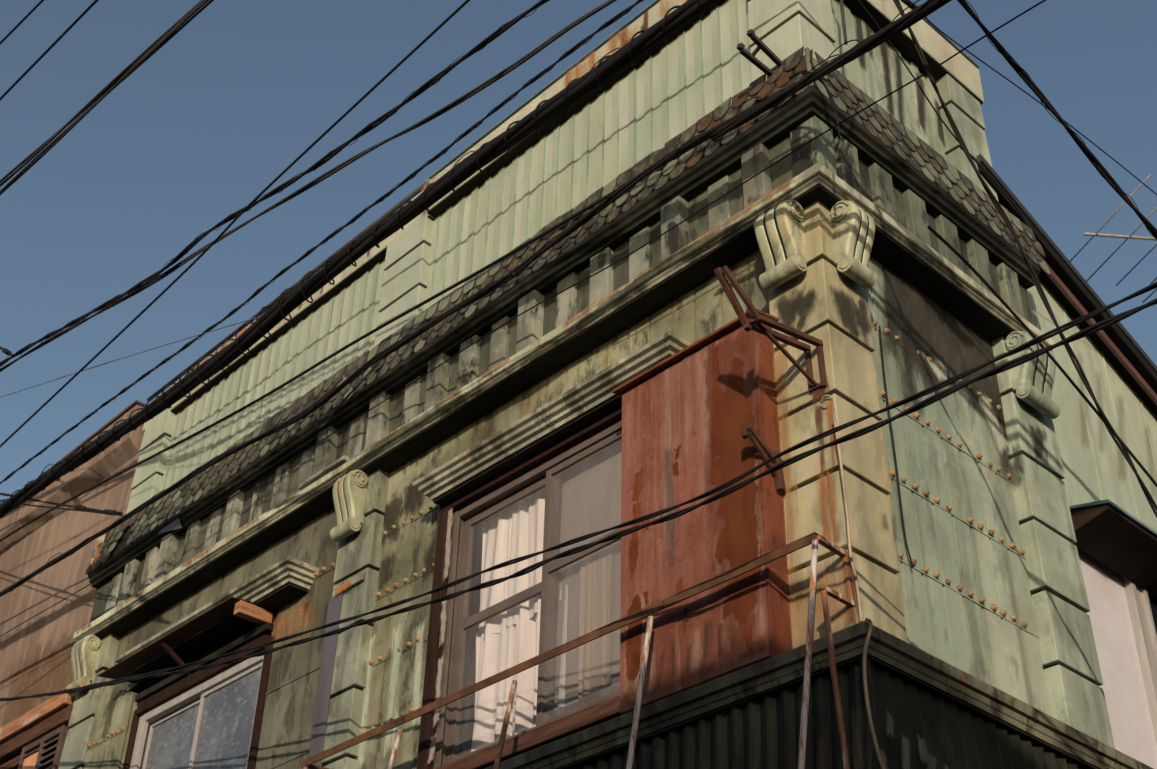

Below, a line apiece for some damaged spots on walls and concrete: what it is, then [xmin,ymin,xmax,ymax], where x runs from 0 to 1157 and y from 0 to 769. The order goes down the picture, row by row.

leakage [775,290,815,330]
leakage [834,290,872,340]
corrosion [672,444,681,475]
corrosion [813,387,839,541]
corrosion [628,468,650,579]
leakage [3,637,76,726]
corrosion [625,591,649,683]